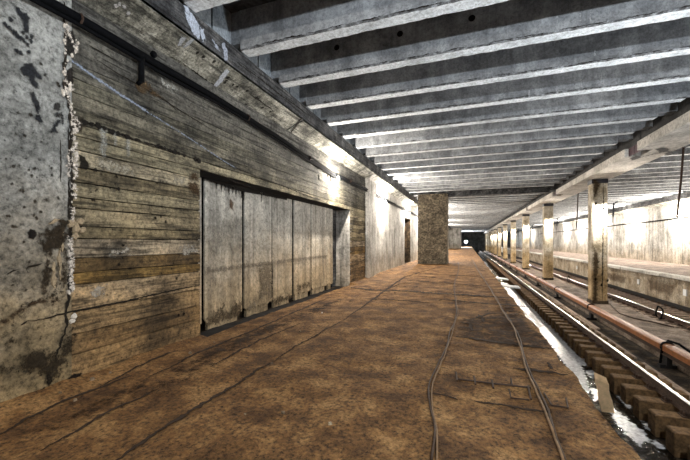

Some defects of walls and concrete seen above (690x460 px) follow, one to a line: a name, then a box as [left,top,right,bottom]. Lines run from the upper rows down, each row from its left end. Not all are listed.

leakage [16,7,30,33]
leakage [20,63,43,122]
leakage [51,102,64,133]
crack [0,297,330,451]